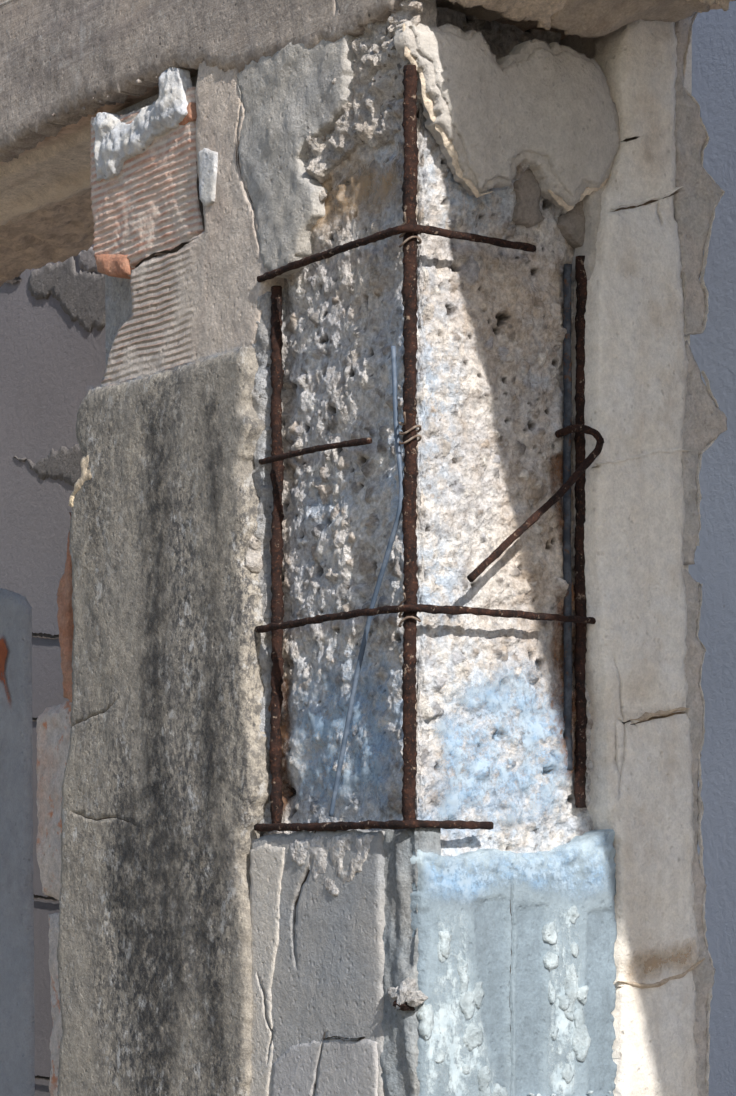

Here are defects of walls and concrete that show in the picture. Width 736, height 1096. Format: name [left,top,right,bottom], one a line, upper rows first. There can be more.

spalling [179,102,197,125]
spalling [28,247,135,332]
spalling [13,444,92,508]
spalling [245,0,620,1096]
rust [550,454,564,540]
rust [551,583,577,776]
water stain [112,418,185,1096]
water stain [203,660,223,835]
rust [268,680,294,810]
crack [294,870,310,935]
water stain [196,847,219,1091]